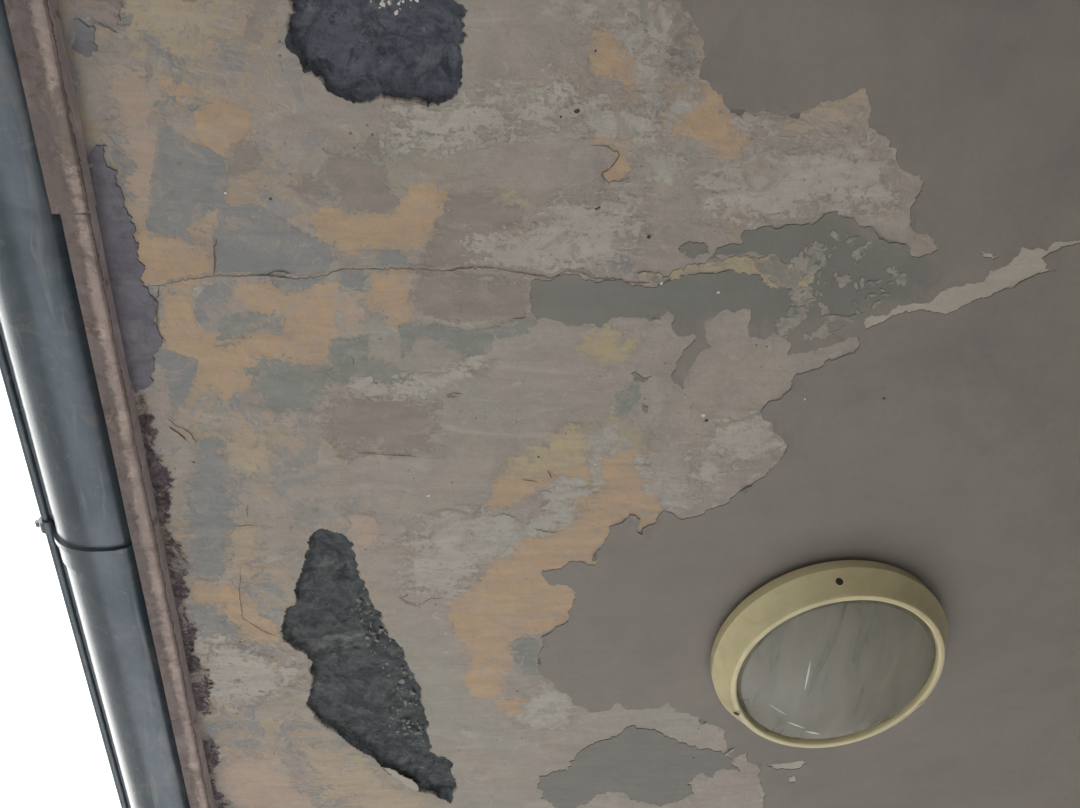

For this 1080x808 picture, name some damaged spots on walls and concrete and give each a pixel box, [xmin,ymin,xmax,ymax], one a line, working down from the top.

spalling [70,0,133,34]
spalling [284,0,469,108]
spalling [87,144,390,393]
crack [143,239,671,329]
peeling [863,240,1080,329]
spalling [136,393,216,716]
spalling [280,528,458,803]
spalling [202,737,245,808]
peeling [768,761,806,783]